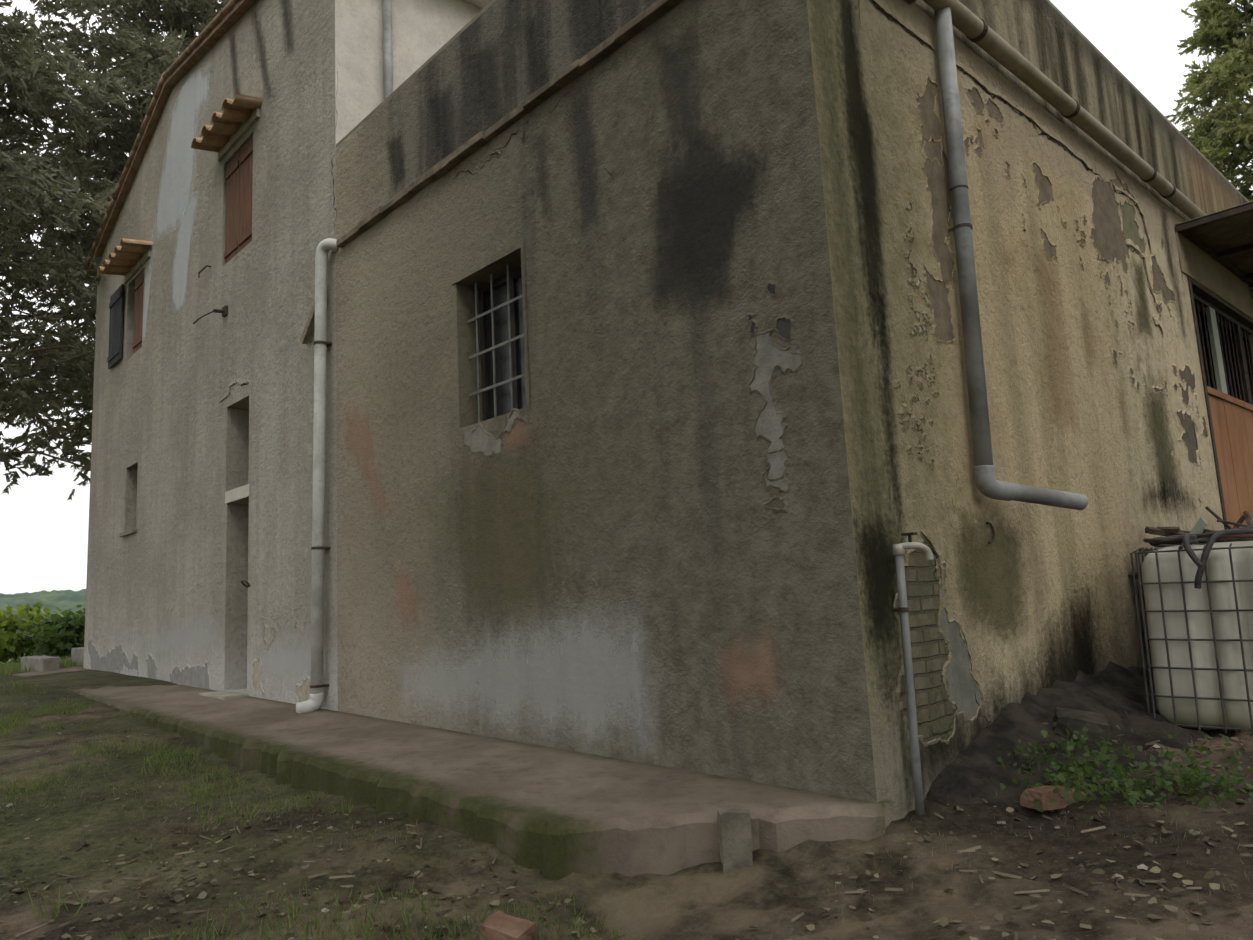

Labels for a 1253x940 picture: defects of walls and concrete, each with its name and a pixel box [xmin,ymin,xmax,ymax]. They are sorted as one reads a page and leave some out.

leakage [819,0,901,522]
peeling [963,85,1004,157]
crack [858,0,1183,335]
leakage [1036,4,1104,122]
peeling [1004,160,1177,334]
leakage [1122,97,1158,172]
peeling [746,313,804,494]
peeling [1111,347,1209,470]
leakage [858,470,895,679]
peeling [893,538,982,747]